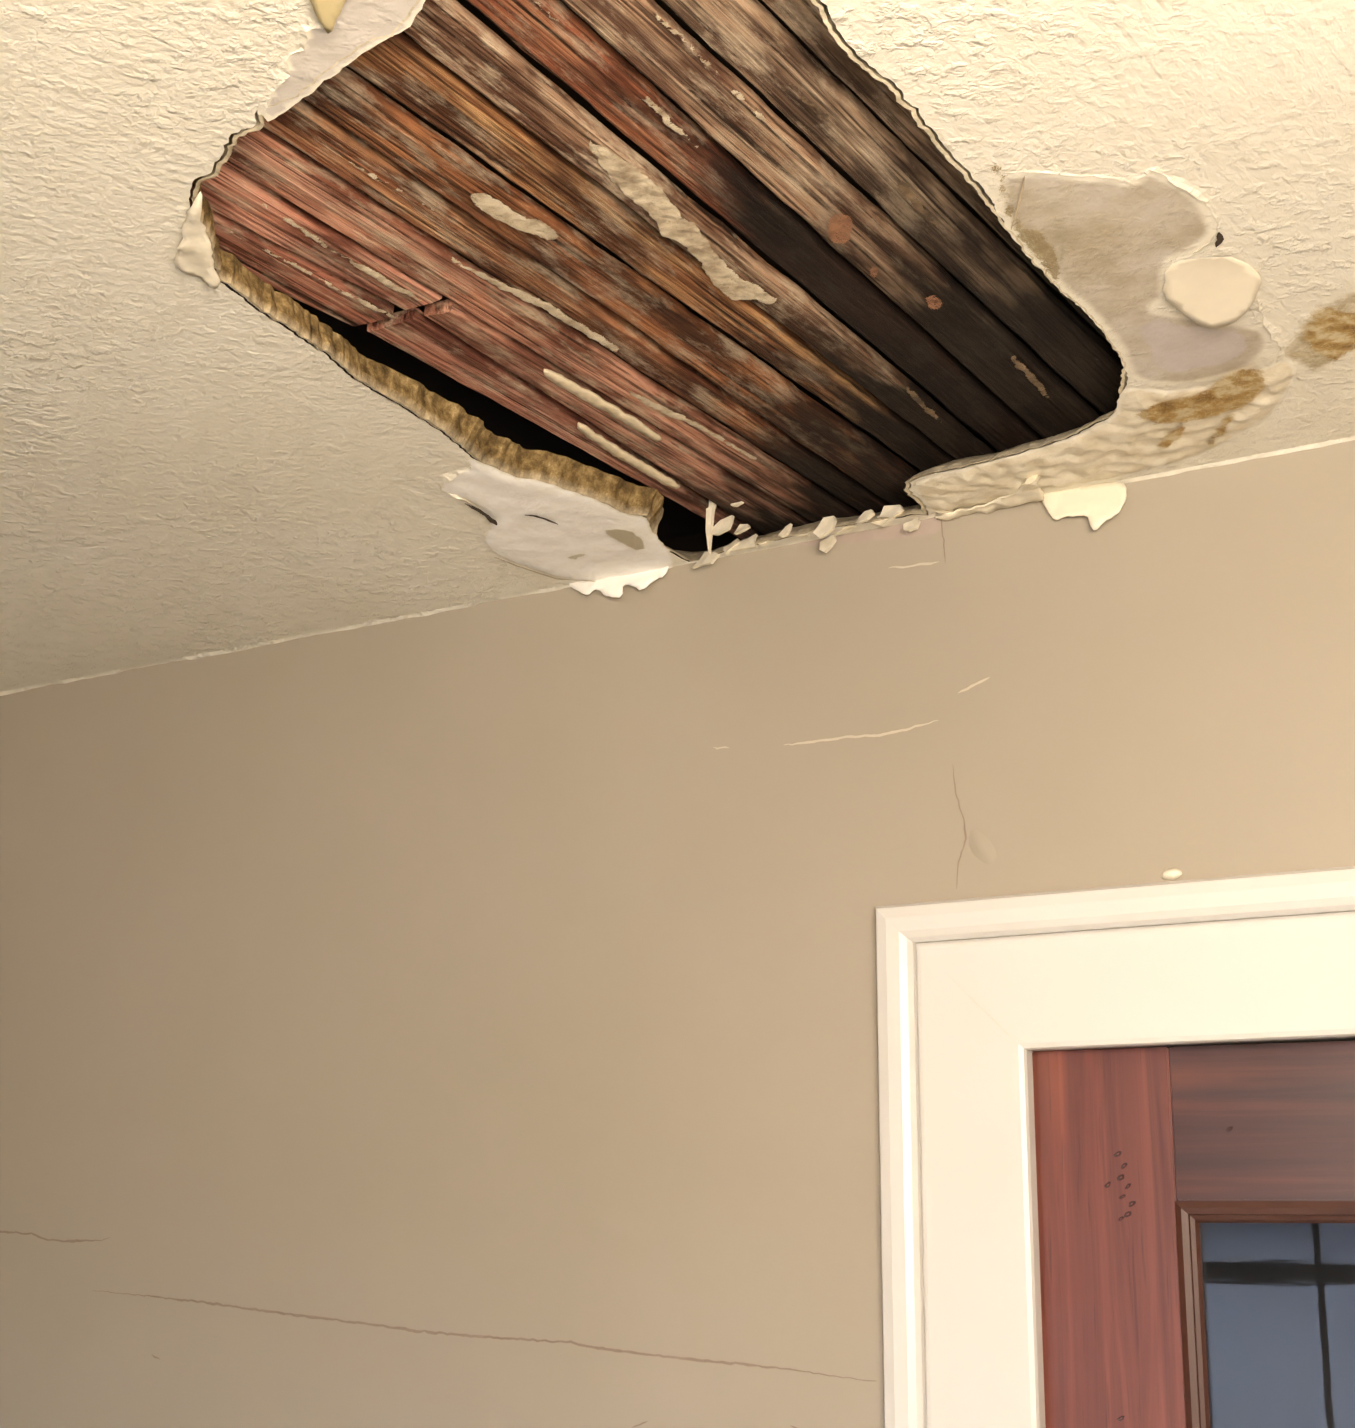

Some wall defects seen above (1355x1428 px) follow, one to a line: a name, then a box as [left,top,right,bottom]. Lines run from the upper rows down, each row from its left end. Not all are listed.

peeling [174,0,1287,598]
crack [0,1230,111,1243]
crack [93,1290,876,1382]